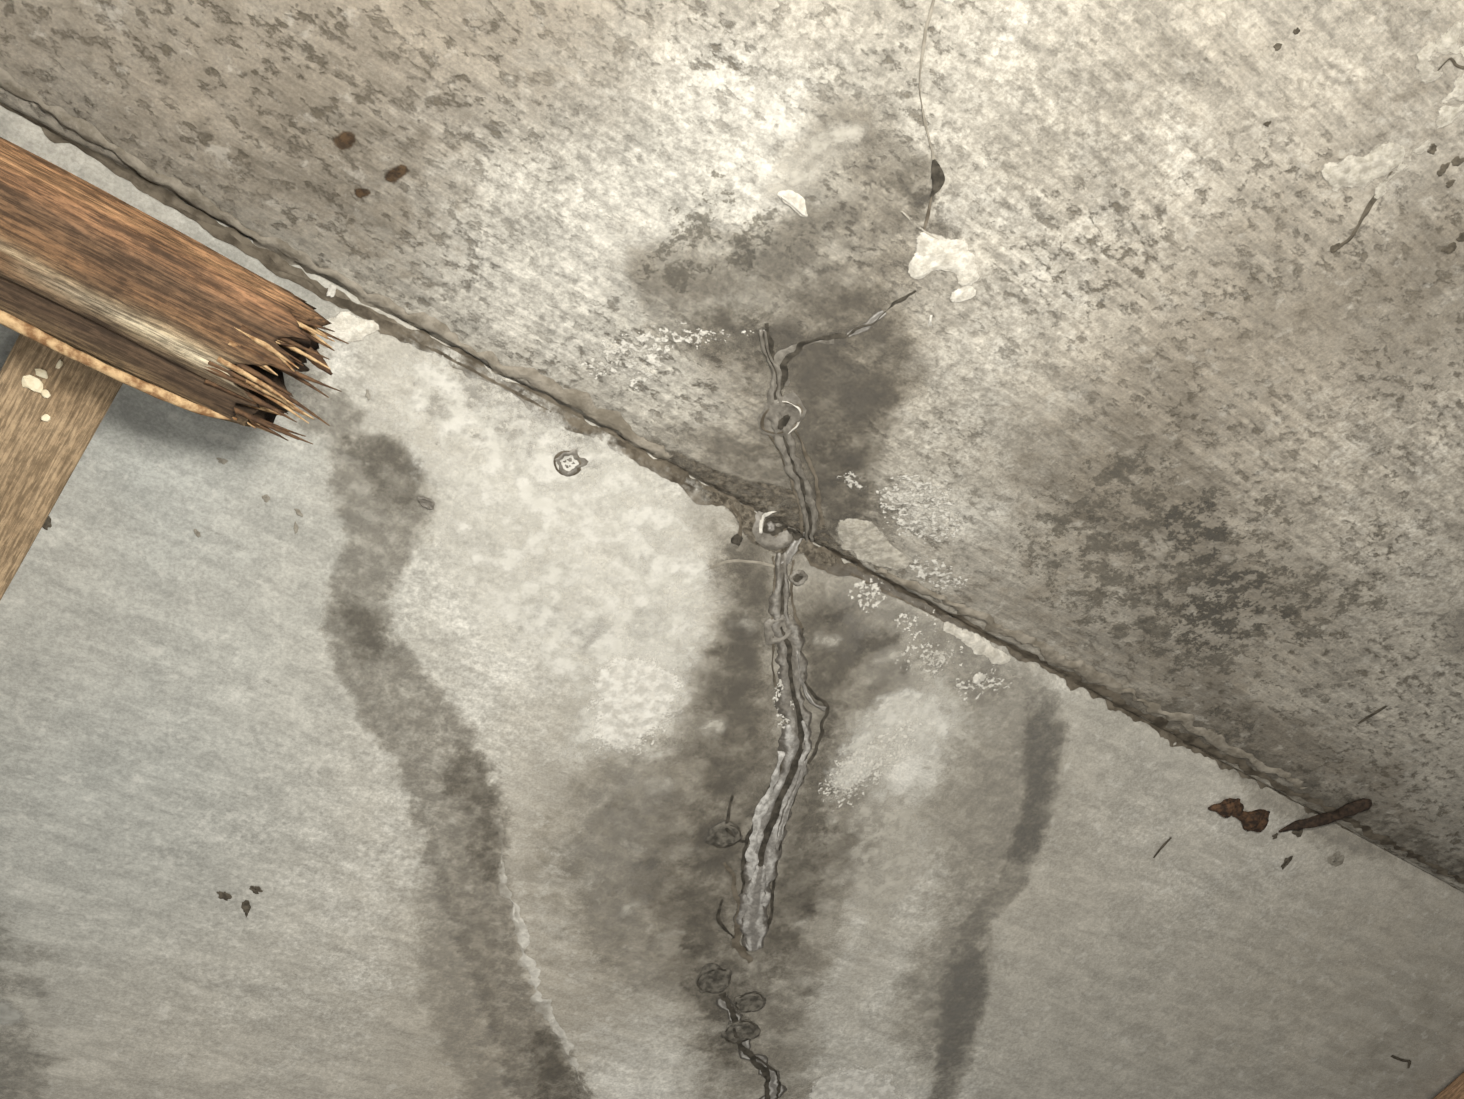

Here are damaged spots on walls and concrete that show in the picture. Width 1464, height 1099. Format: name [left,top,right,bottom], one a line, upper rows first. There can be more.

crack [919,0,936,160]
water stain [768,126,862,194]
crack [924,196,932,230]
peeling [901,211,980,302]
water stain [581,323,754,392]
water stain [374,350,709,756]
water stain [837,471,969,594]
water stain [773,679,794,728]
crack [696,290,917,1099]
water stain [818,578,1012,934]
water stain [496,814,594,1099]